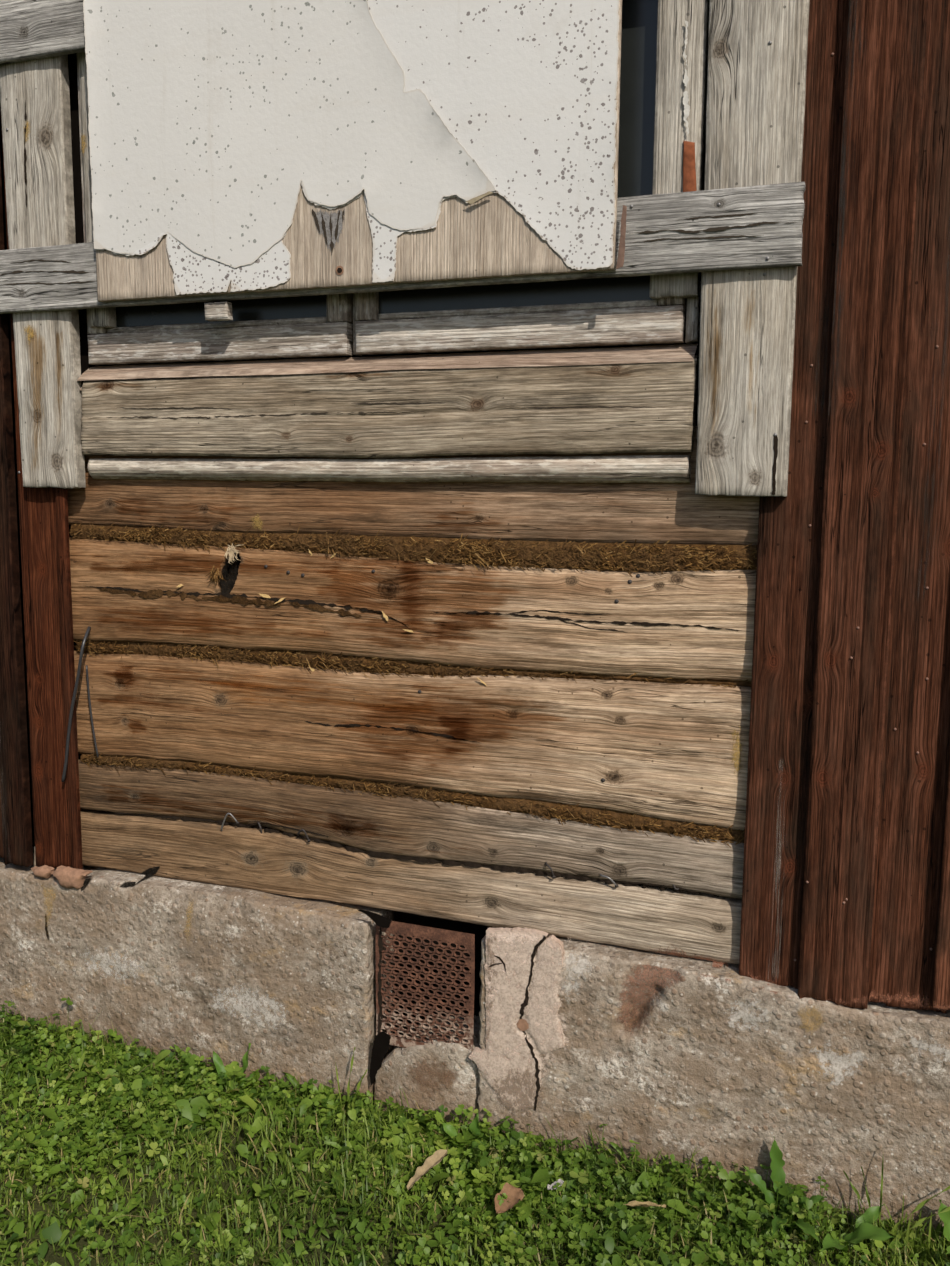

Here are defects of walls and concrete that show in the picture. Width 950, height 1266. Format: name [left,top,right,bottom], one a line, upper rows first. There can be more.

peeling [83,0,627,295]
crack [86,586,750,632]
crack [489,936,546,1111]